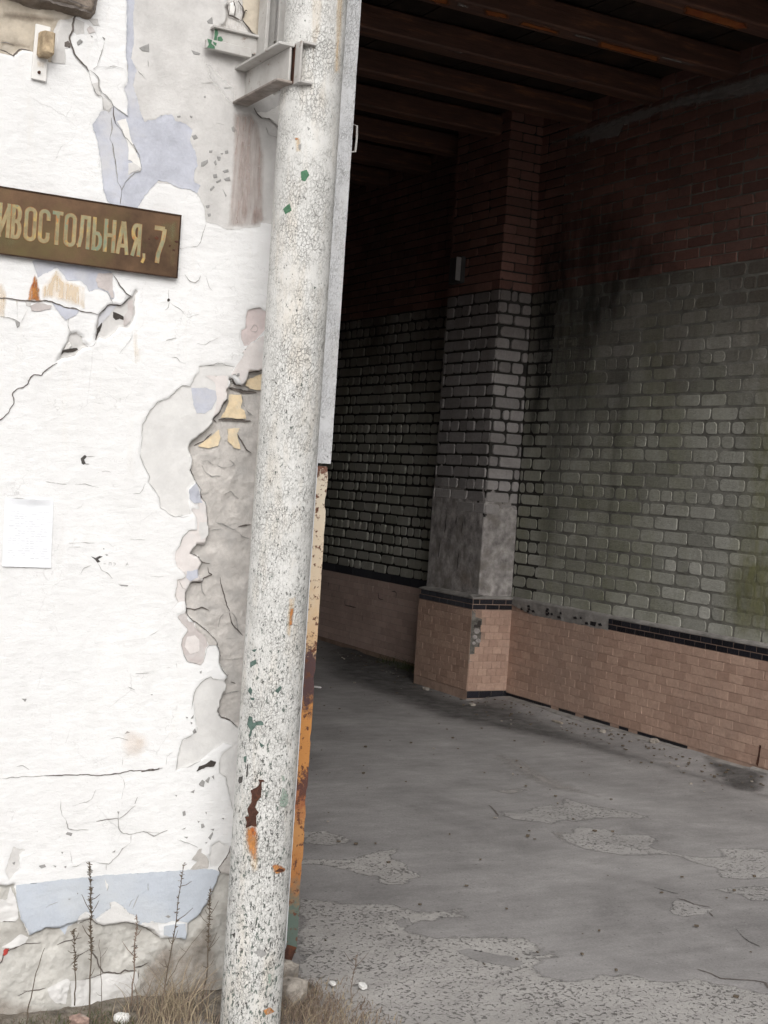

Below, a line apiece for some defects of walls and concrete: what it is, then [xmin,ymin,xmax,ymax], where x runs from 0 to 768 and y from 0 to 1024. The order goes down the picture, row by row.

peeling [93,0,292,230]
crack [0,276,131,347]
peeling [32,260,114,299]
peeling [95,300,134,340]
crack [0,363,57,420]
spalling [140,307,266,819]
peeling [512,600,609,631]
crack [3,761,167,867]
rust [245,779,265,859]
spalling [0,811,235,1015]